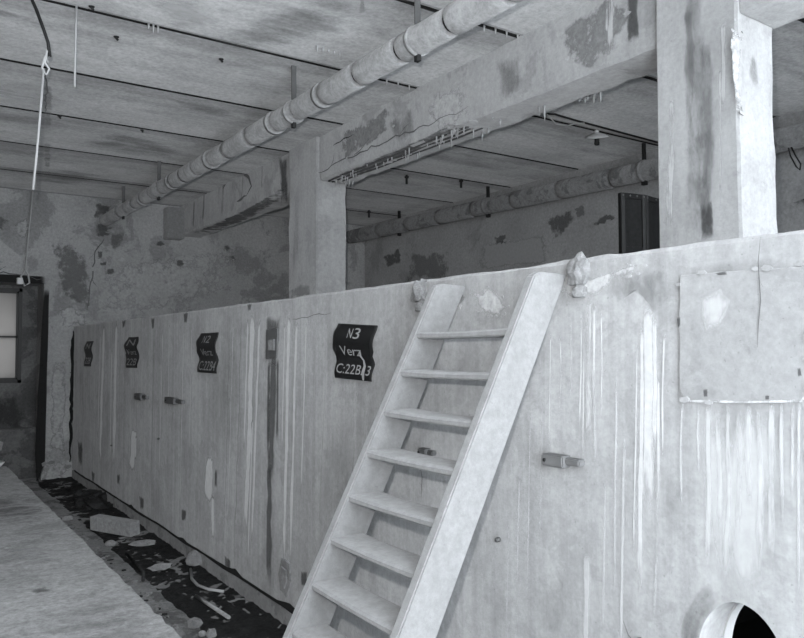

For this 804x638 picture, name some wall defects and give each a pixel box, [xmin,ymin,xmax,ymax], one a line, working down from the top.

water stain [606,0,614,45]
spalling [328,82,501,189]
water stain [702,205,712,234]
crack [756,245,764,347]
water stain [570,305,603,447]
water stain [603,313,665,638]
water stain [697,410,800,563]